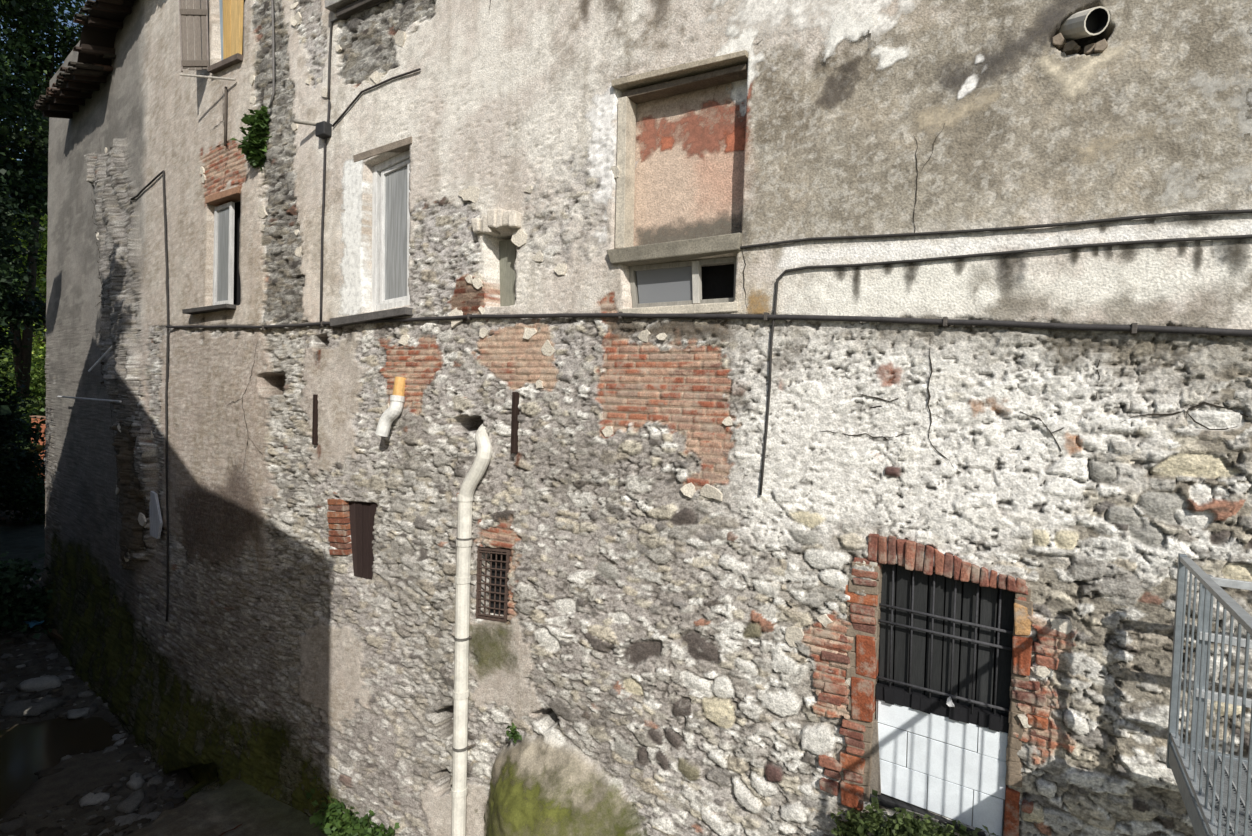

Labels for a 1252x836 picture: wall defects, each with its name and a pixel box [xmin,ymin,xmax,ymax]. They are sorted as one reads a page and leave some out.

spalling [278,0,388,101]
peeling [636,0,913,162]
damp [918,0,1123,129]
crack [913,123,945,233]
spalling [294,202,303,262]
spalling [379,186,556,414]
damp [837,267,860,294]
damp [884,262,918,281]
damp [1071,245,1135,261]
damp [1157,241,1202,267]
spalling [597,292,742,501]
crack [1120,402,1249,430]